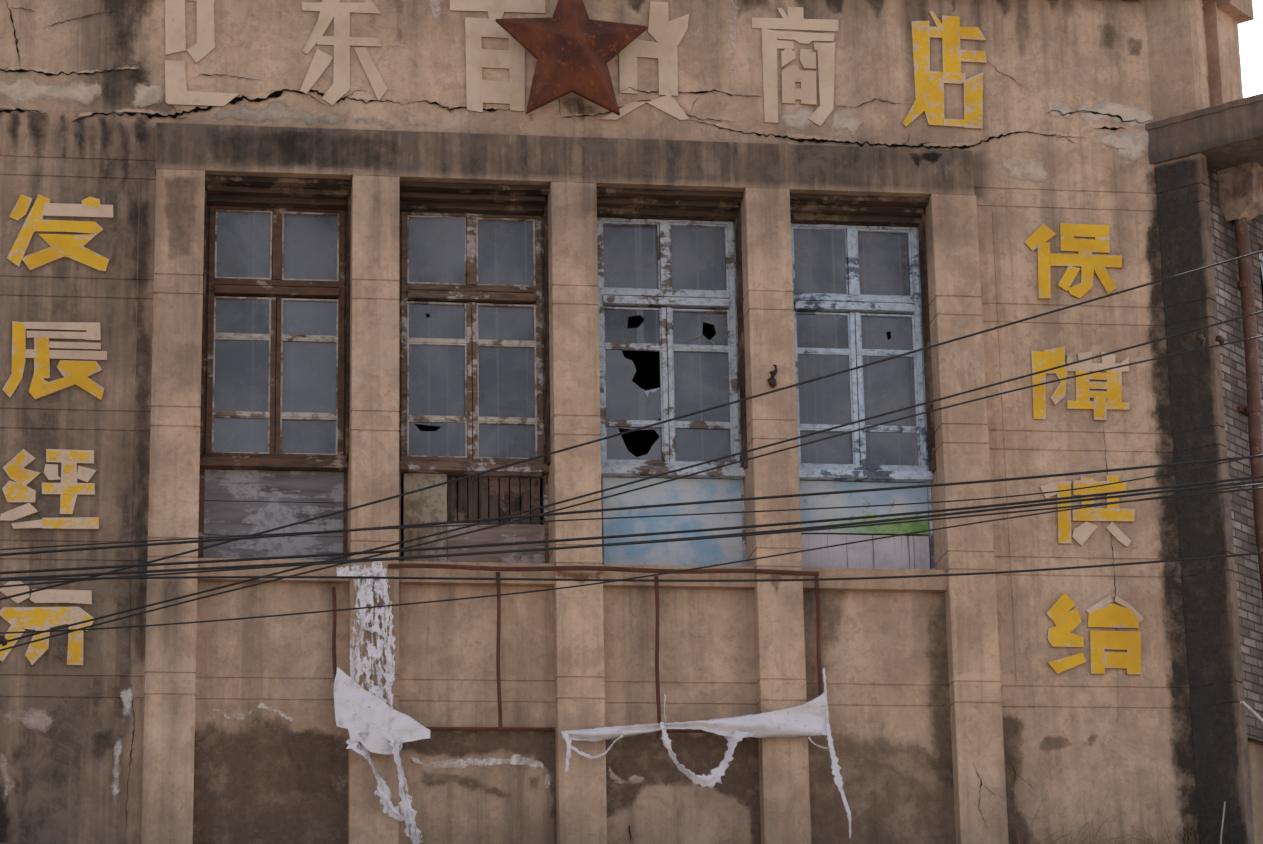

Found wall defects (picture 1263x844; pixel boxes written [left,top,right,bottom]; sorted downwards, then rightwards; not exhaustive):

crack [0,1,141,76]
leakage [11,113,45,146]
flaking render [0,78,101,104]
flaking render [133,84,163,108]
crack [0,74,510,122]
crack [558,87,1152,149]
flaking render [1047,100,1153,160]
leakage [0,785,10,843]